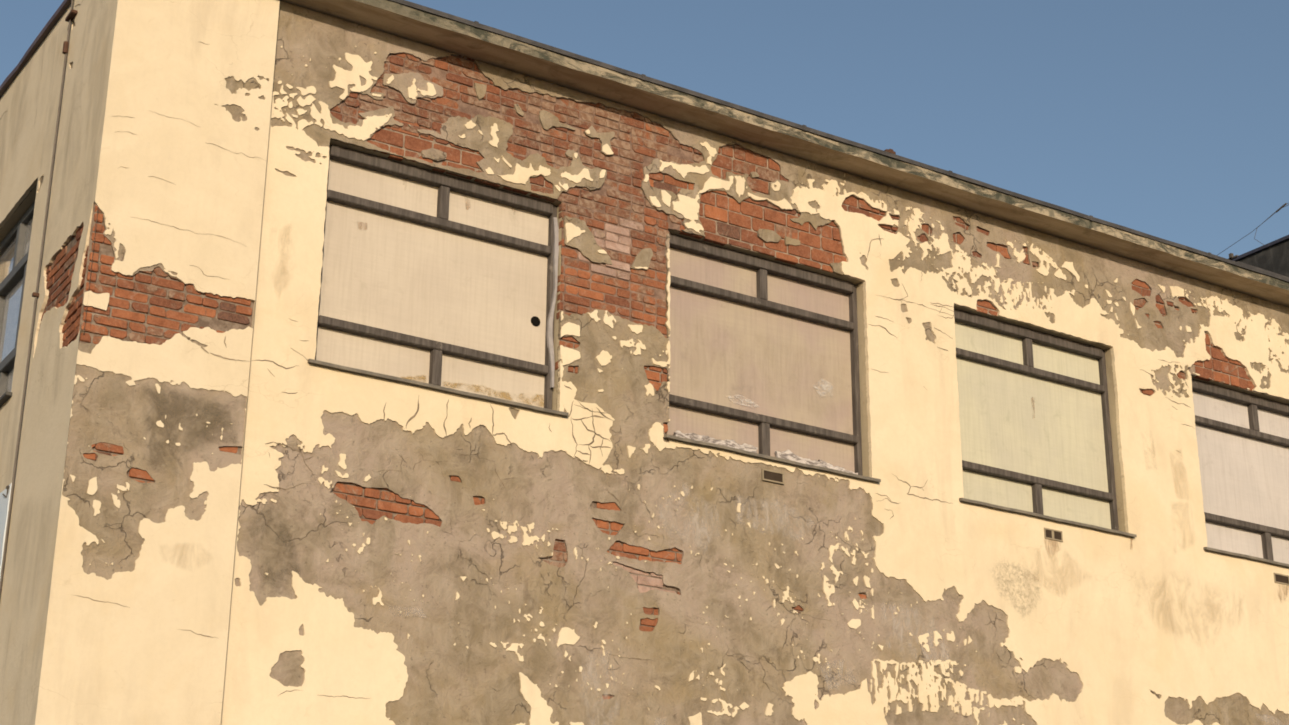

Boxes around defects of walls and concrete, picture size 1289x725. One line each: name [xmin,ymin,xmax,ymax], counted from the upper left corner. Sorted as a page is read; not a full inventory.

peeling [222,105,259,131]
peeling [225,76,269,96]
crack [133,217,245,246]
peeling [842,173,1289,358]
peeling [39,203,254,580]
crack [549,385,611,463]
peeling [237,1,1082,725]
flaking render [1139,331,1271,398]
peeling [1150,691,1289,725]